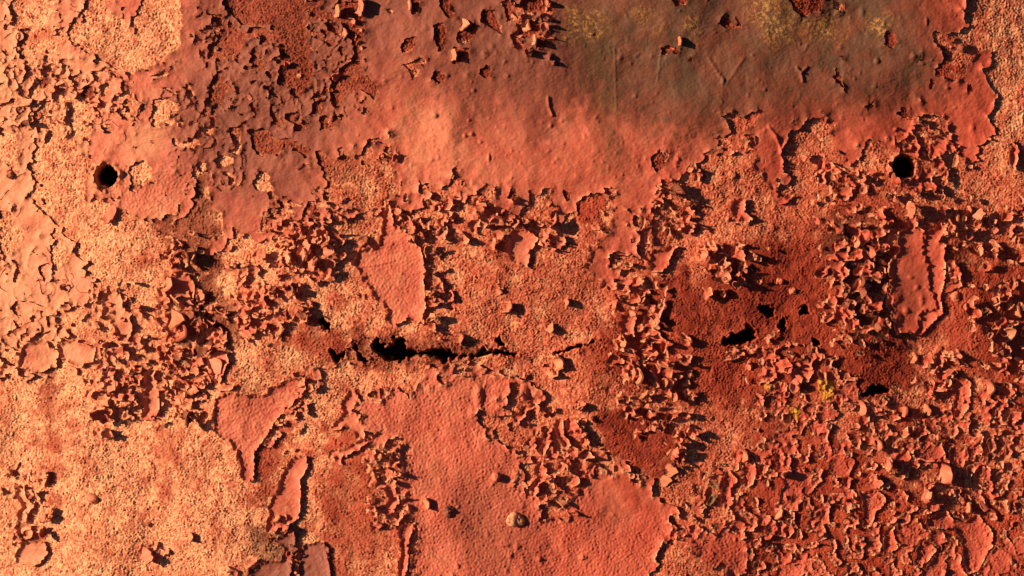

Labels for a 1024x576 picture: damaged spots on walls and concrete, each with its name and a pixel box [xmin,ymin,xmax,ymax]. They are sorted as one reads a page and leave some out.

peeling [418,0,552,65]
corrosion [156,173,239,354]
crack [354,335,517,364]
crack [555,339,602,354]
corrosion [589,220,913,410]
peeling [962,295,992,332]
corrosion [944,251,1024,411]
peeling [988,274,1024,318]
corrosion [594,407,674,478]
corrosion [749,424,1024,576]
peeling [763,542,834,576]
peeling [840,505,969,576]